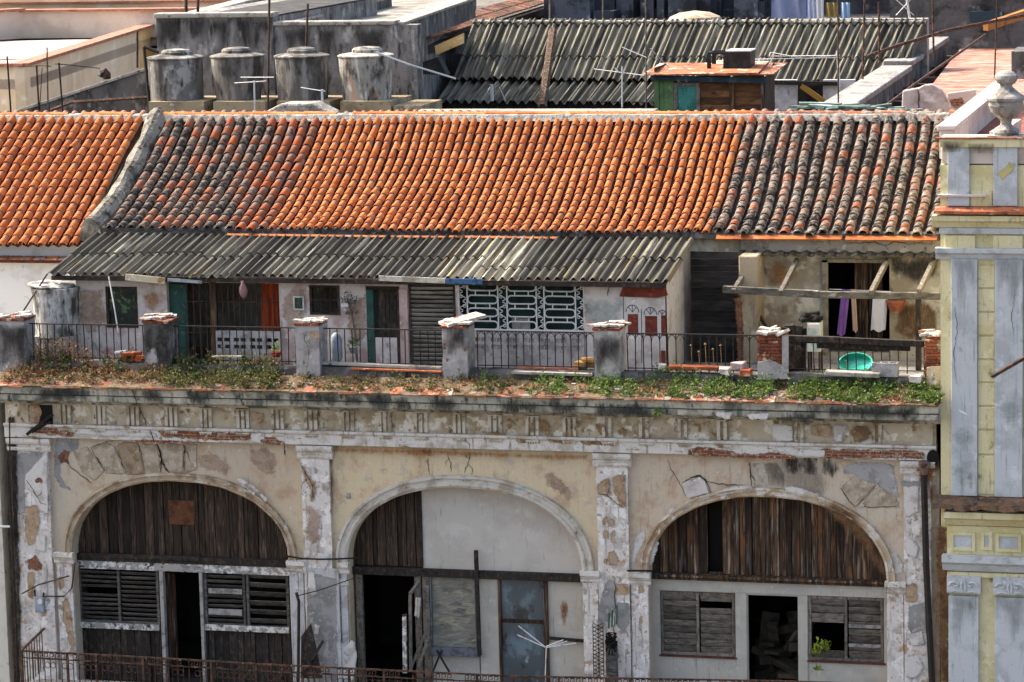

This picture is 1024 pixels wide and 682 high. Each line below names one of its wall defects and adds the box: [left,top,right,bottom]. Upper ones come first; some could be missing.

damp [264,393,407,410]
damp [431,398,454,412]
damp [500,400,536,414]
damp [595,404,647,417]
crack [64,390,190,482]
crack [426,440,473,475]
crack [669,463,755,494]
spalling [668,413,819,513]
flaking render [842,476,920,517]
flaking render [24,403,281,656]
flaking render [301,466,357,682]
peeling [890,538,926,678]